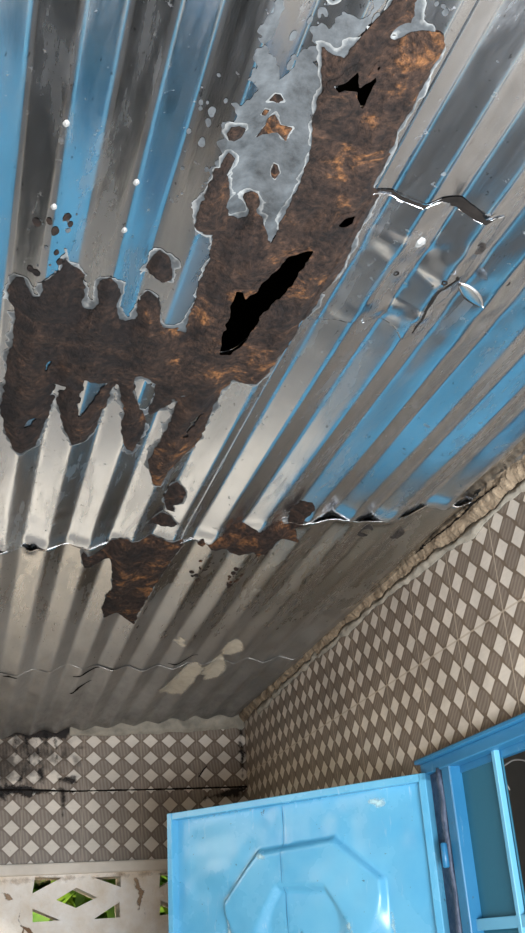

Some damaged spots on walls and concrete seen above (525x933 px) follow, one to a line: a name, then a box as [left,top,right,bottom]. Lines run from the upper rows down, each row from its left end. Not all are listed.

rust [0,0,448,624]